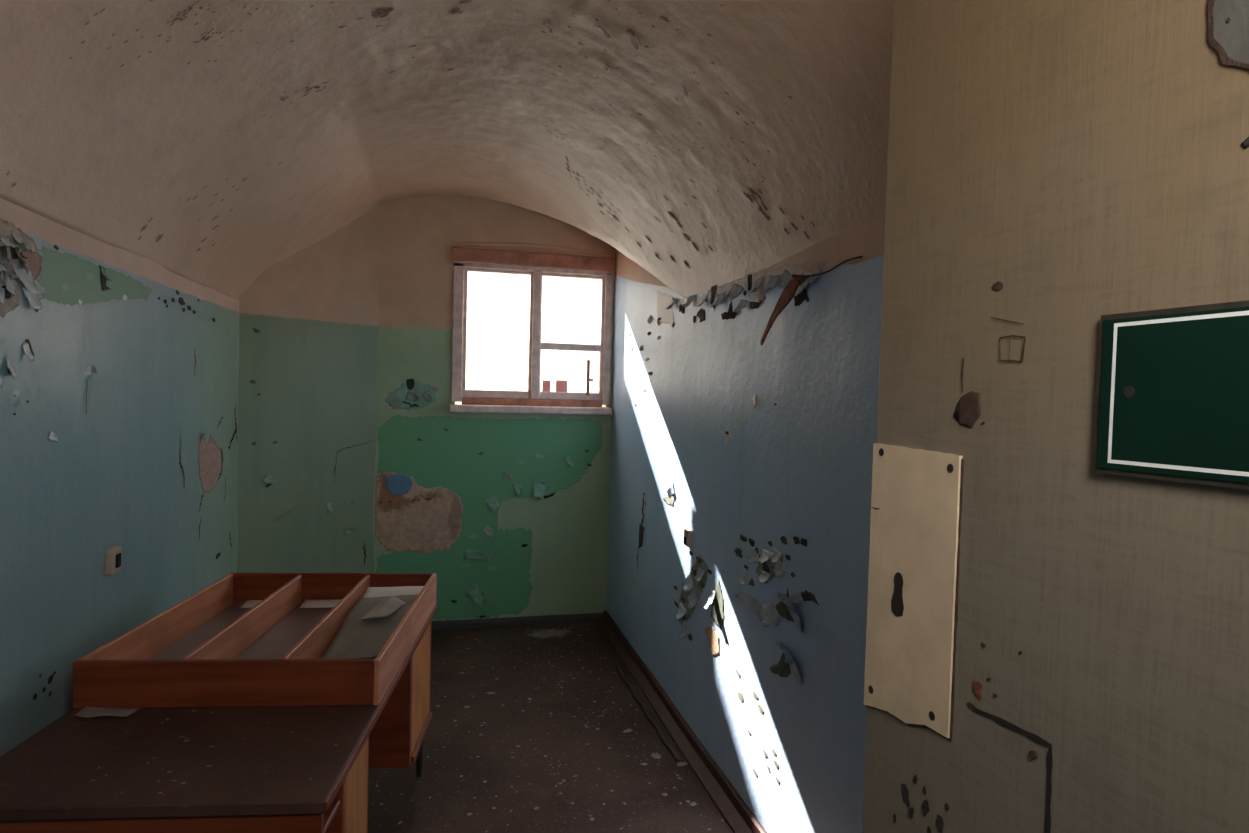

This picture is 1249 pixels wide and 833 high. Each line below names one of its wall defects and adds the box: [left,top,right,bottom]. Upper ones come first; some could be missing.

peeling [0,218,59,318]
peeling [628,259,825,406]
peeling [385,378,440,411]
spalling [198,432,226,541]
spalling [375,471,463,554]
peeling [672,551,720,656]
peeling [734,535,807,627]